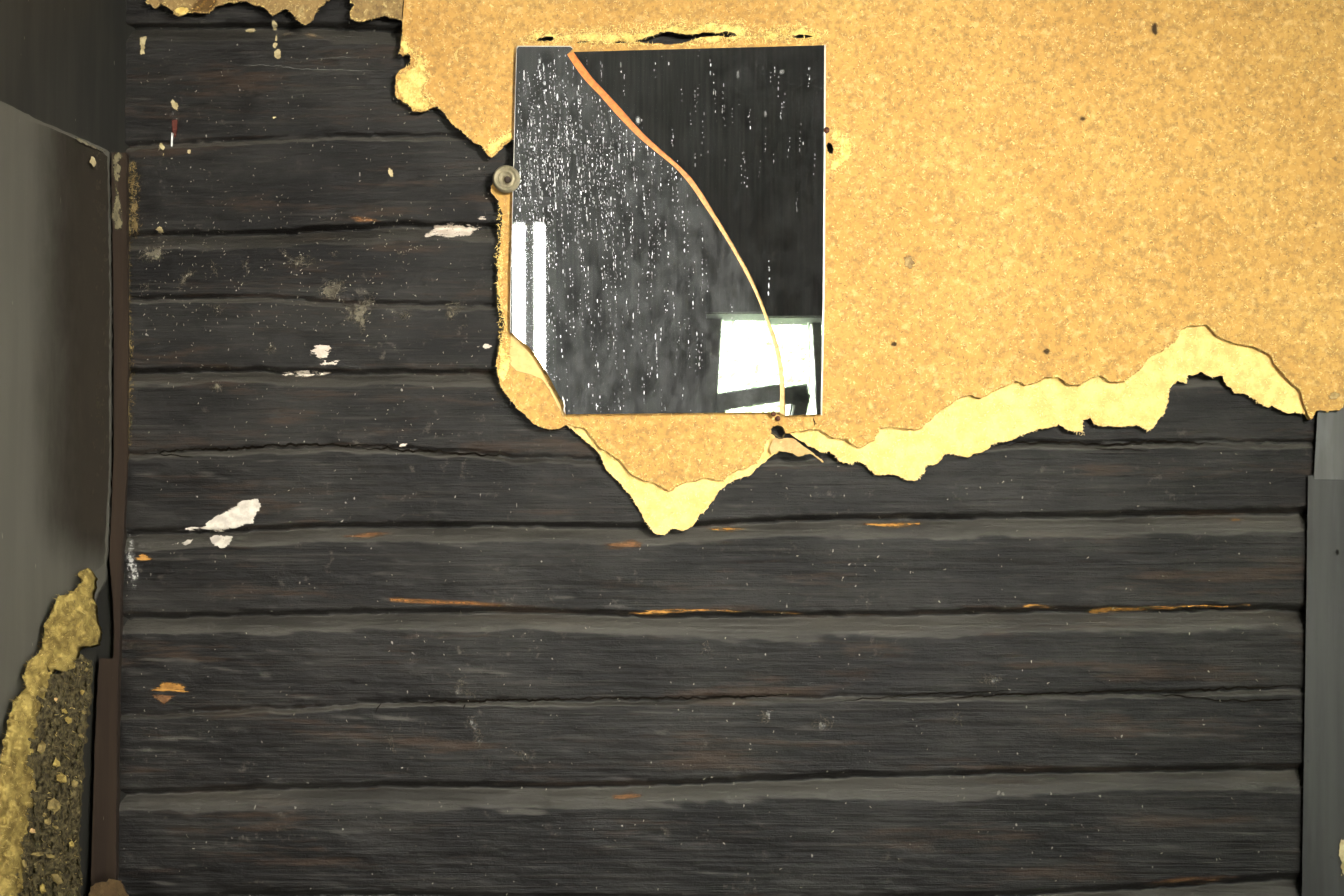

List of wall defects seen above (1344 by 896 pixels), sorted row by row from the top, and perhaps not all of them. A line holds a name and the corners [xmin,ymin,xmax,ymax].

peeling [283,360,338,378]
peeling [567,325,1310,536]
spalling [16,653,94,896]